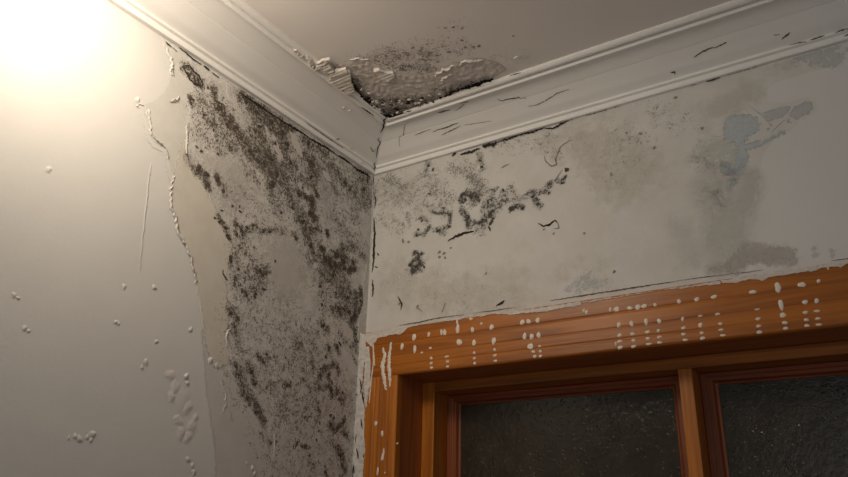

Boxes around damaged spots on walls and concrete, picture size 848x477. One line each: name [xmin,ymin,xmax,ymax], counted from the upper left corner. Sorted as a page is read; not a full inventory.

crack [166,42,219,78]
spalling [293,49,521,118]
leakage [354,26,481,74]
crack [498,89,569,107]
crack [776,28,848,45]
crack [452,107,616,181]
peeling [704,100,814,206]
crack [242,94,489,297]
flaking render [136,37,374,477]
crack [397,296,514,326]
leakage [171,42,848,477]
crack [551,270,761,301]